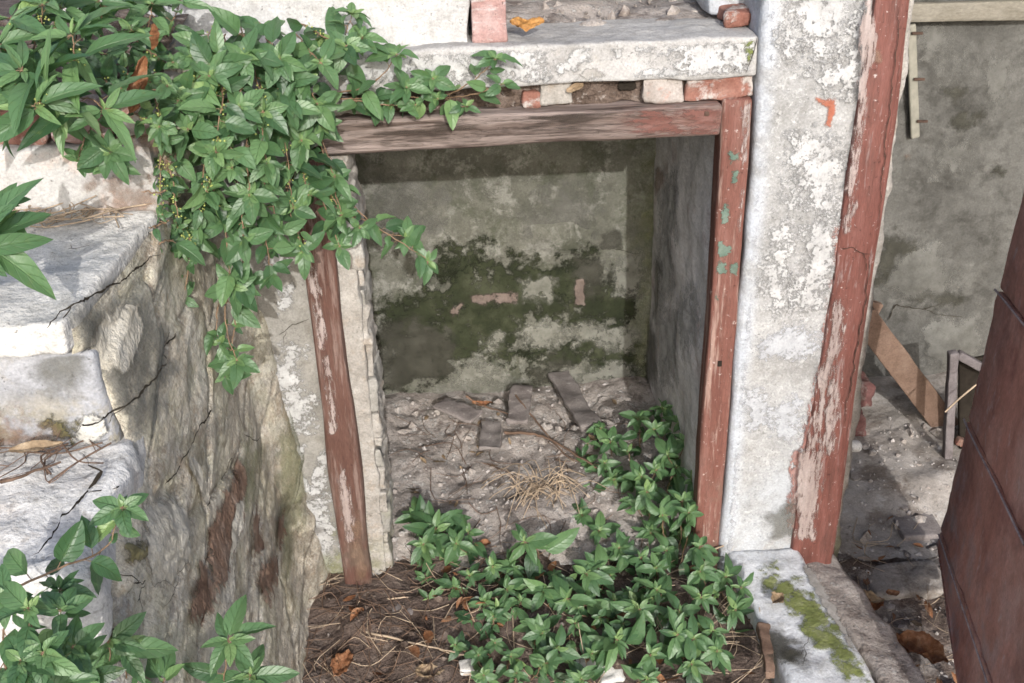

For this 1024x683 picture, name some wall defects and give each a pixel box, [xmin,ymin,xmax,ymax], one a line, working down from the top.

crack [47,254,161,336]
peeling [450,276,557,317]
leakage [373,193,661,393]
flaking render [574,278,586,306]
peeling [738,0,882,542]
crack [33,327,176,555]
crack [165,409,212,484]
leakage [189,453,210,503]
leakage [227,501,244,586]
leakage [769,630,807,665]